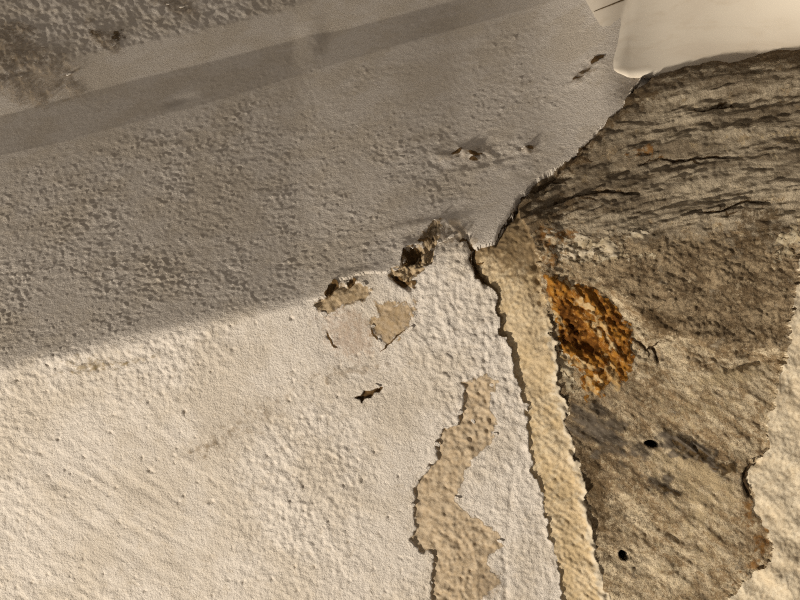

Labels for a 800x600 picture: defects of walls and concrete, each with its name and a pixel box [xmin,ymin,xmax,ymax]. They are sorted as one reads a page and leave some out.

flaking render [572,54,604,80]
flaking render [388,217,457,289]
flaking render [311,277,372,319]
peeling [368,299,417,351]
rust [540,228,640,402]
spalling [355,384,383,403]
peeling [408,374,503,600]